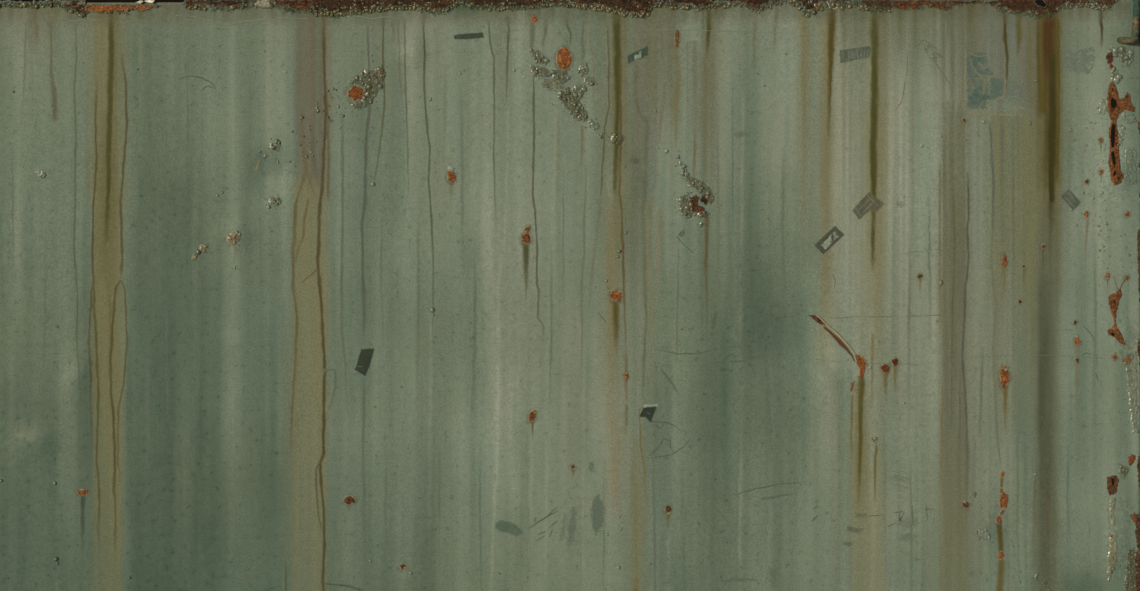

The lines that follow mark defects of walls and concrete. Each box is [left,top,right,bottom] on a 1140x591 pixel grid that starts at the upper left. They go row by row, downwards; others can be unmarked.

corrosion [0,0,161,19]
corrosion [182,0,1121,26]
corrosion [552,43,576,73]
corrosion [1082,81,1140,187]
corrosion [517,223,536,303]
corrosion [1102,192,1140,365]
corrosion [995,470,1010,591]